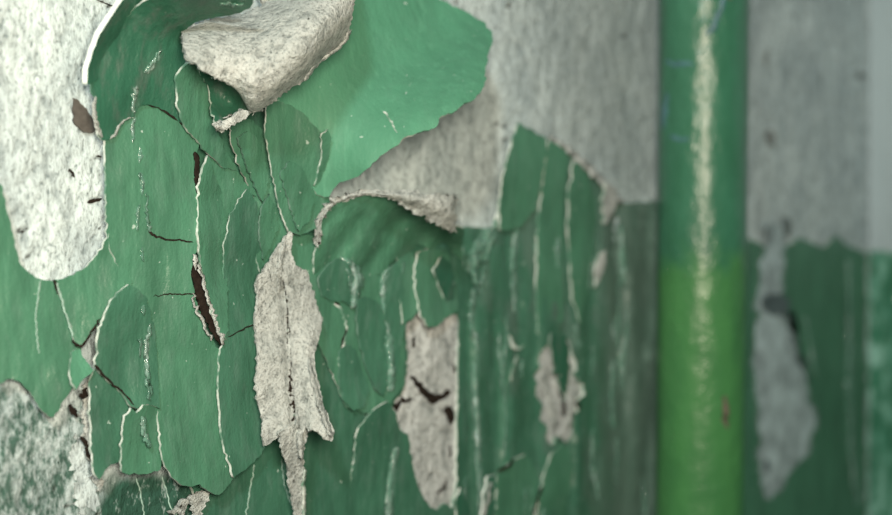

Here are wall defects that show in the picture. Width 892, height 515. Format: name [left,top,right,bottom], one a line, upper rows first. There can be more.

crack [149,105,182,125]
crack [192,152,200,185]
crack [35,280,100,353]
crack [94,365,134,405]
crack [148,231,253,345]
peeling [0,0,623,515]
crack [334,302,348,366]
peeling [609,226,630,485]
spalling [751,220,819,500]
crack [136,478,145,515]
crack [161,476,177,515]
crack [245,464,255,515]